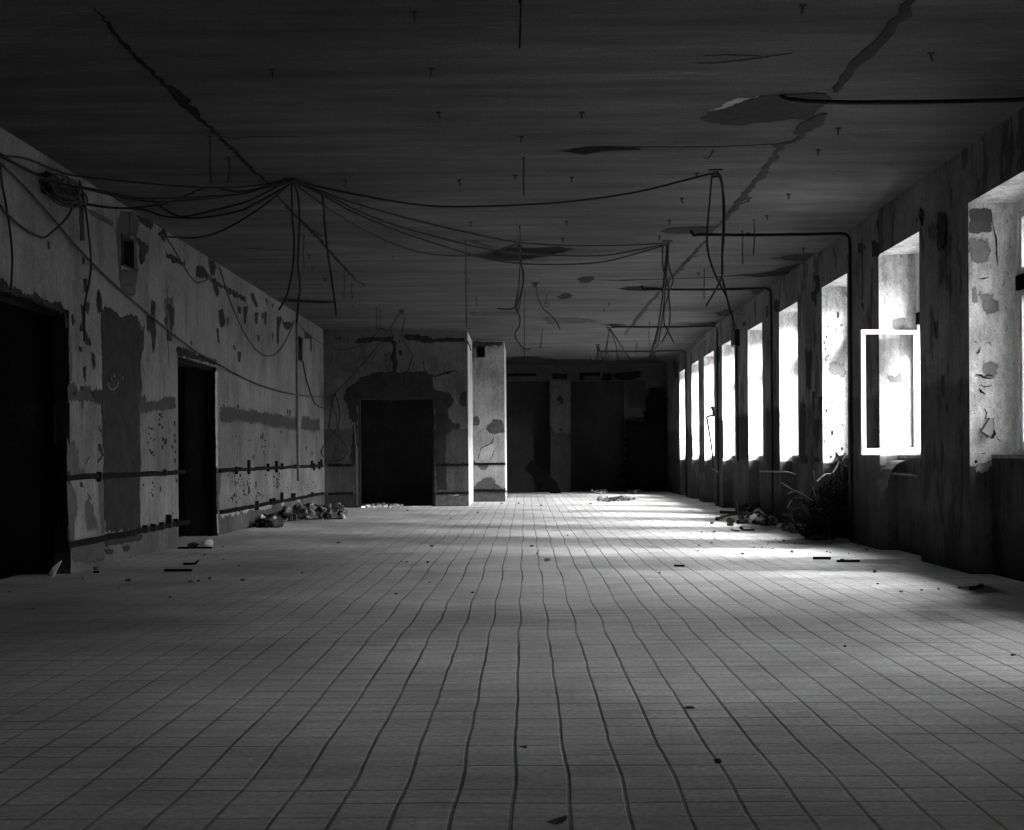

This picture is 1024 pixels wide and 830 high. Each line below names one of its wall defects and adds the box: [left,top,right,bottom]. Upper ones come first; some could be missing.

crack [93,7,364,287]
spalling [699,93,832,126]
crack [624,0,916,335]
spalling [968,208,998,265]
flaking render [0,278,320,534]
flaking render [343,371,467,491]
flaking render [473,416,505,435]
spalling [980,408,1000,441]